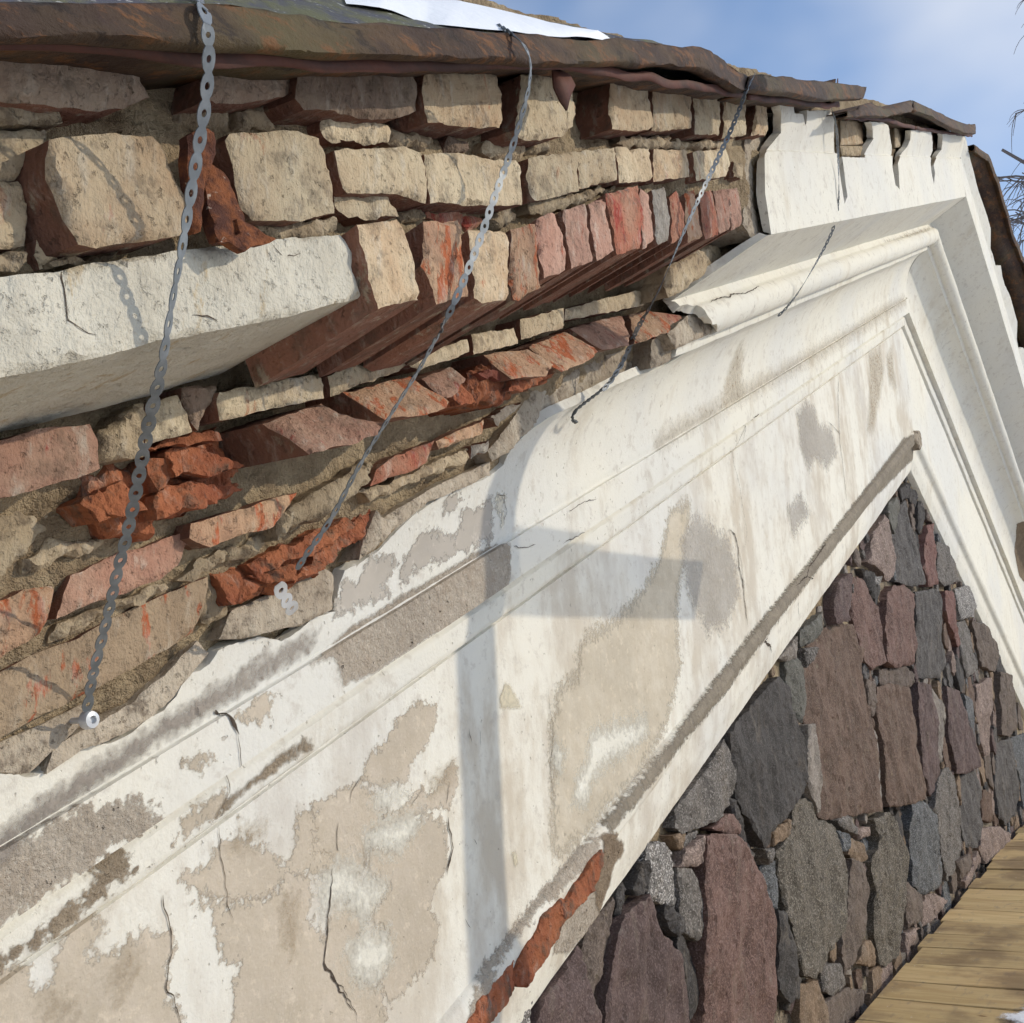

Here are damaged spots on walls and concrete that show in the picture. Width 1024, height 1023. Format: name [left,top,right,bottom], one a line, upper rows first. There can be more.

flaking render [0,61,773,775]
crack [215,710,242,803]
peeling [469,501,690,1017]
spalling [0,793,163,929]
peeling [171,700,459,1023]
peeling [0,912,185,1023]
crack [163,899,181,1023]
crack [323,874,357,1020]